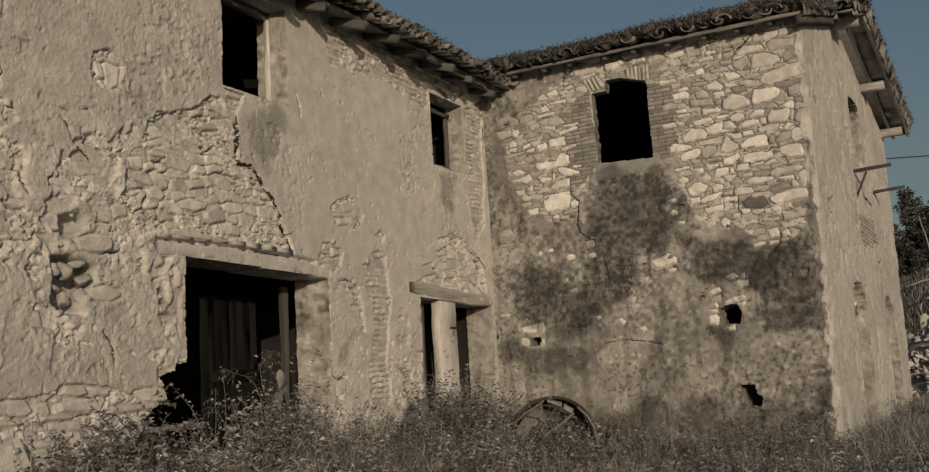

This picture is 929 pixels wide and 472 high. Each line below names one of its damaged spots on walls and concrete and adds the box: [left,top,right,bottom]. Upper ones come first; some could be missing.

flaking render [0,96,19,130]
flaking render [90,47,124,91]
flaking render [110,87,294,258]
flaking render [318,12,487,295]
flaking render [363,230,393,440]
flaking render [0,384,165,468]